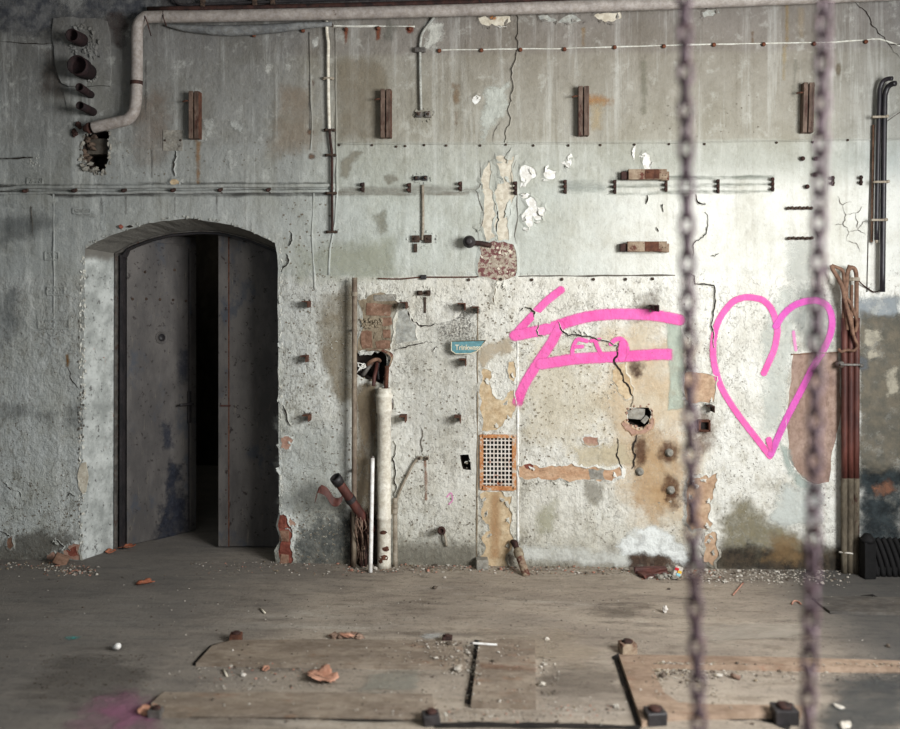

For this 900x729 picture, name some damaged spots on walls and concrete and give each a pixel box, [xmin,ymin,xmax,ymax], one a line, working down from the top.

peeling [475,15,515,31]
spalling [71,121,129,178]
crack [478,15,520,243]
peeling [473,147,575,344]
crack [693,194,719,348]
crack [836,199,865,250]
flaking render [161,199,350,564]
peeling [323,288,655,566]
crack [520,306,634,406]
crack [616,435,637,469]
peeling [658,470,725,569]
damp [707,502,841,570]